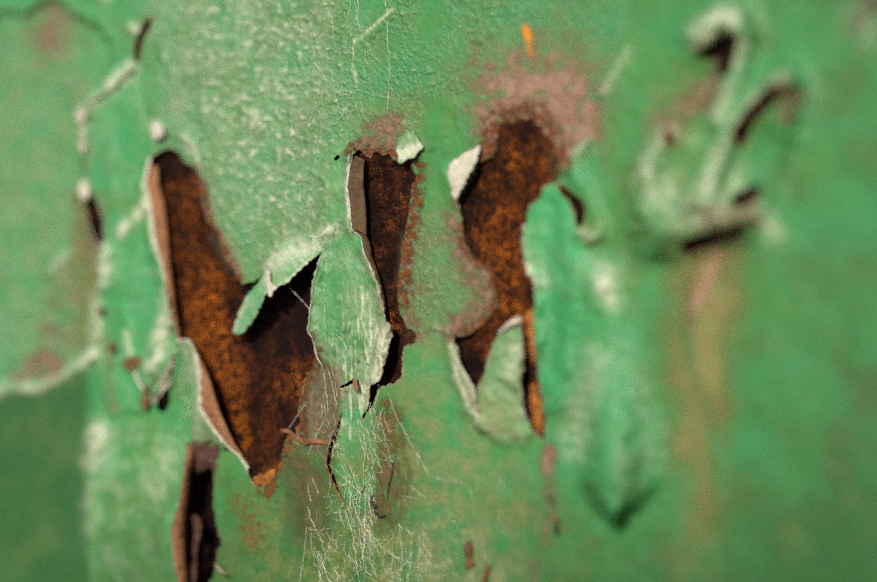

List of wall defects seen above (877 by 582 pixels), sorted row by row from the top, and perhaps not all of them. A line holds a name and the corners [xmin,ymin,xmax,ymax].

crack [133,17,153,63]
rust [355,112,403,158]
rust [467,25,603,164]
peeling [0,2,427,499]
rust [399,182,423,341]
rust [442,203,497,341]
peeling [448,99,589,444]
spalling [186,467,222,582]